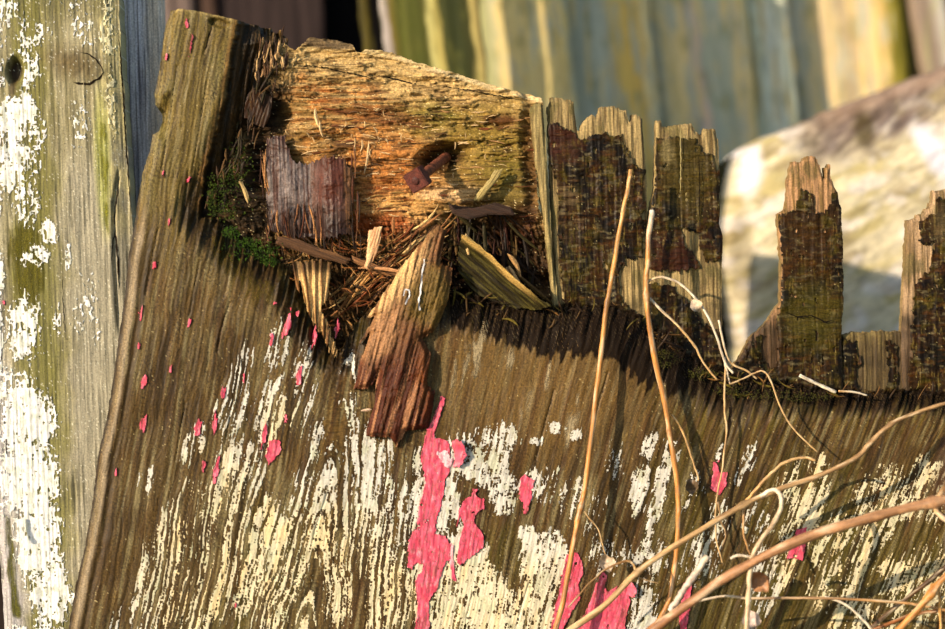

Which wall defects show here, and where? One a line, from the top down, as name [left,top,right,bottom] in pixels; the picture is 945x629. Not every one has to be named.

peeling [0,0,101,629]
peeling [109,308,945,629]